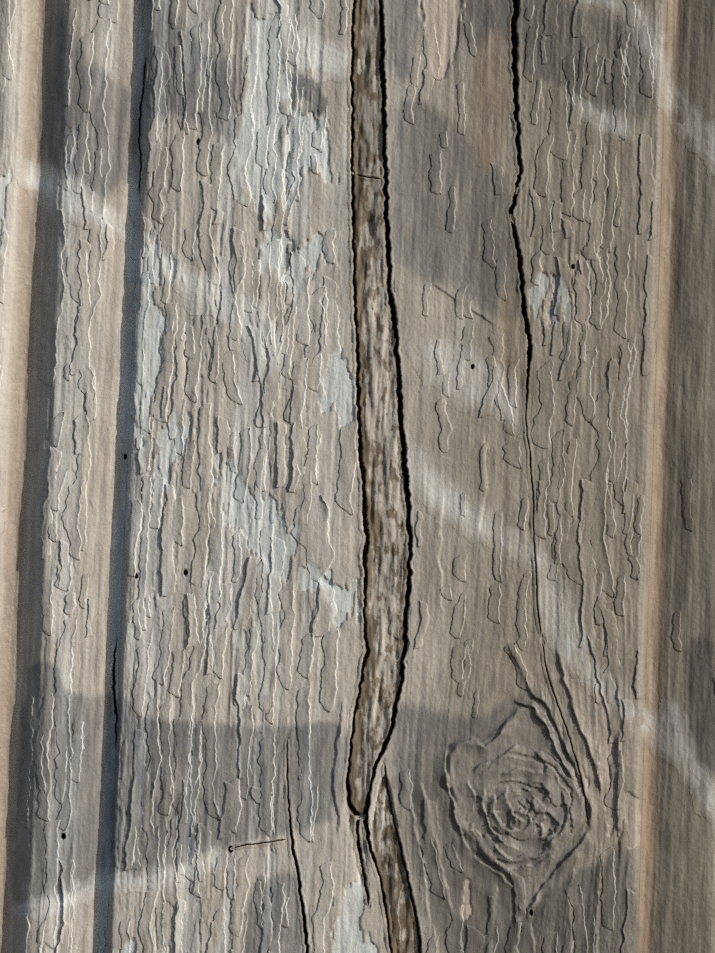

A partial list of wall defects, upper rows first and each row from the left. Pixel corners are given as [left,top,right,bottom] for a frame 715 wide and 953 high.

peeling [0,0,16,95]
peeling [403,0,477,124]
peeling [14,0,119,953]
peeling [97,0,361,953]
crack [342,0,424,953]
peeling [434,285,475,453]
crack [505,0,591,825]
peeling [479,0,659,953]
peeling [440,554,480,718]
crack [230,735,312,953]
peeling [311,862,378,953]
peeling [399,769,527,953]